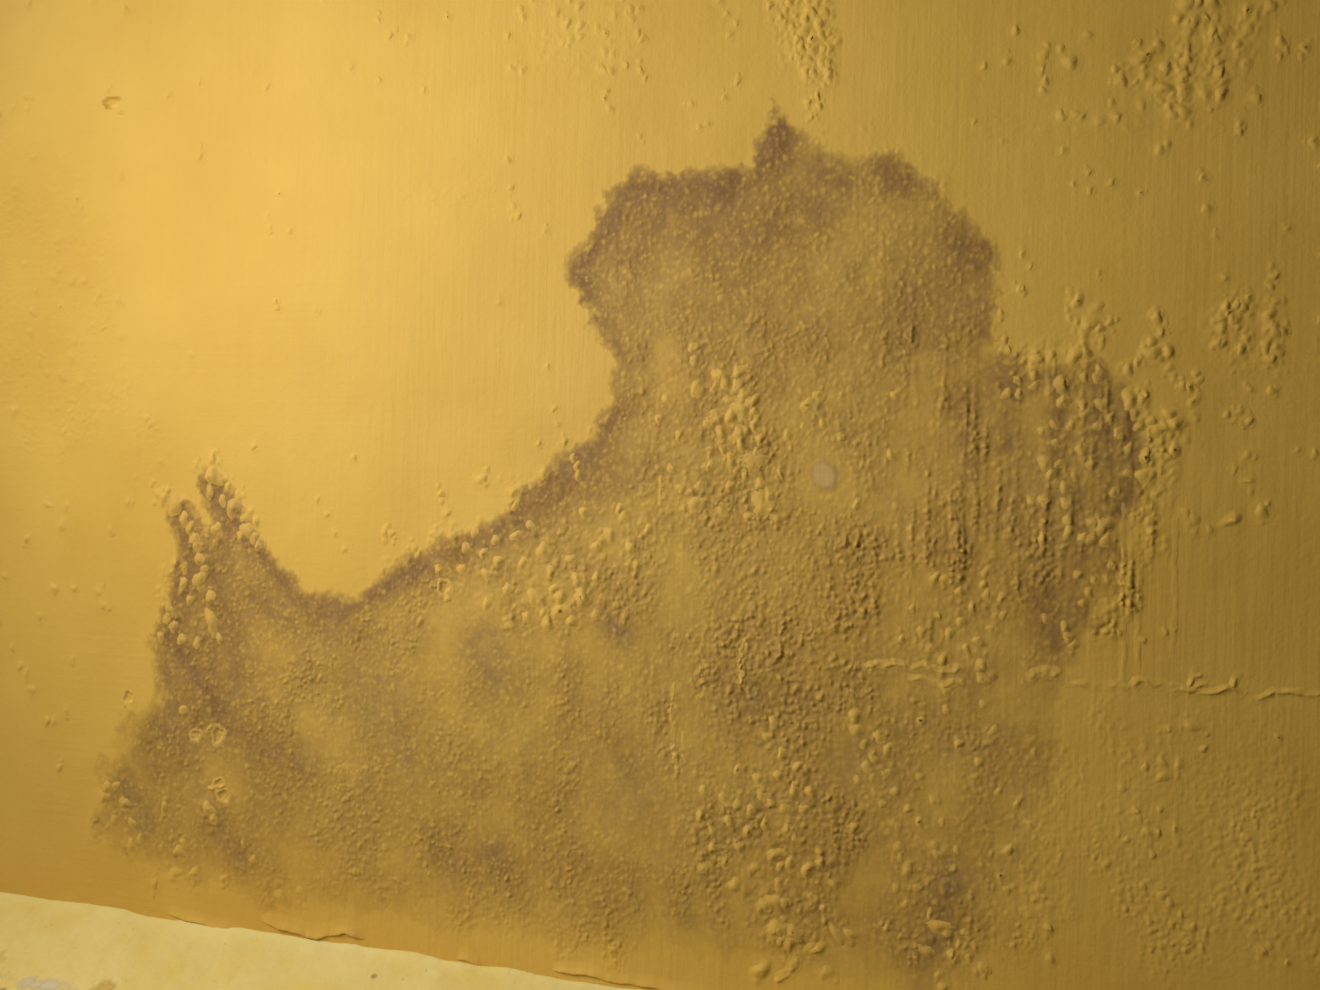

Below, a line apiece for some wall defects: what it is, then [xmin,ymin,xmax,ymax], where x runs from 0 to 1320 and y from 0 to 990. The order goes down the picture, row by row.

damp [571,120,792,301]
damp [164,510,228,721]
damp [210,484,431,621]
damp [447,409,621,557]